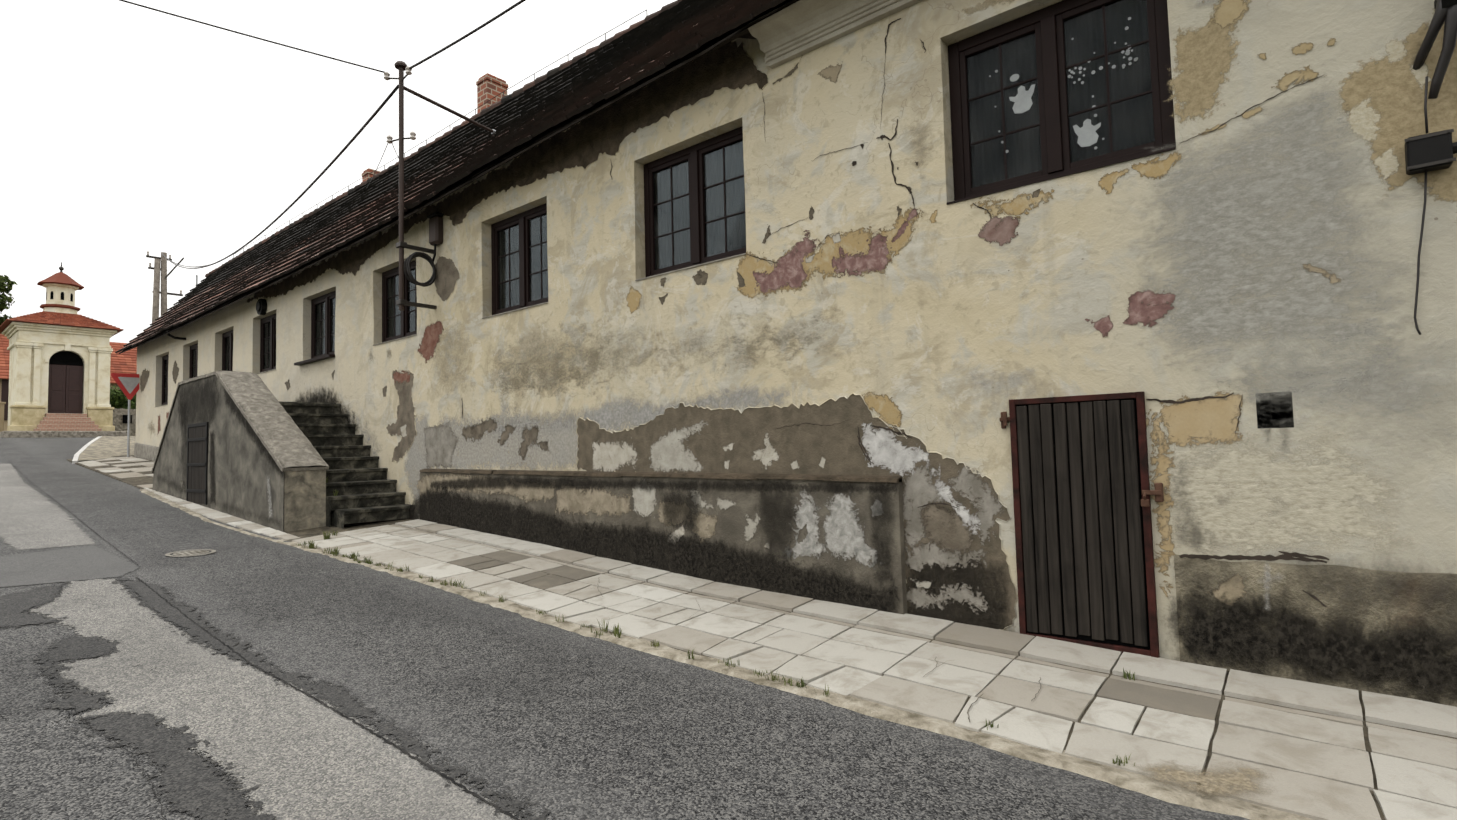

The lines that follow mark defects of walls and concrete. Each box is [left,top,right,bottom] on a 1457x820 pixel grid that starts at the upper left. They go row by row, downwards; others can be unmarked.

flaking render [247,40,802,303]
peeling [626,277,668,314]
peeling [736,202,937,299]
crack [815,18,926,206]
peeling [970,188,1055,246]
peeling [1085,290,1176,338]
peeling [1098,0,1457,202]
flaking render [382,321,1018,630]
leakage [406,389,1006,630]
flaking render [1146,386,1243,597]
flaking render [1207,573,1247,604]
leakage [1168,586,1457,704]